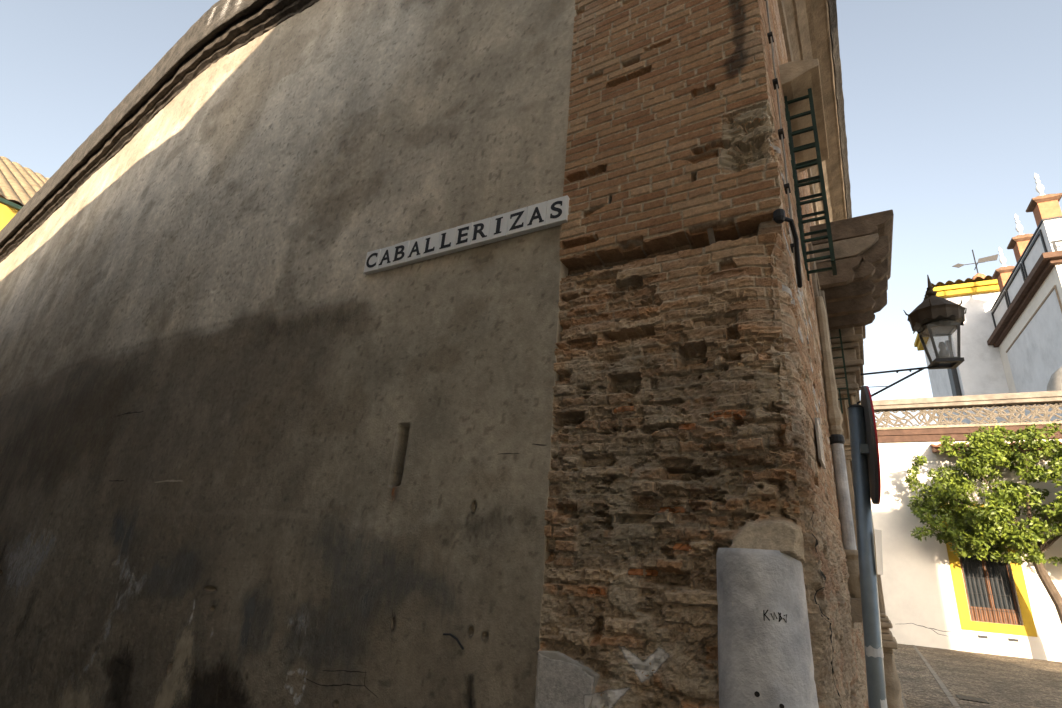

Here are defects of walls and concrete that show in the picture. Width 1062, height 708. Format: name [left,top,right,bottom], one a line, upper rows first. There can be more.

spalling [718,106,773,171]
water stain [173,658,251,708]